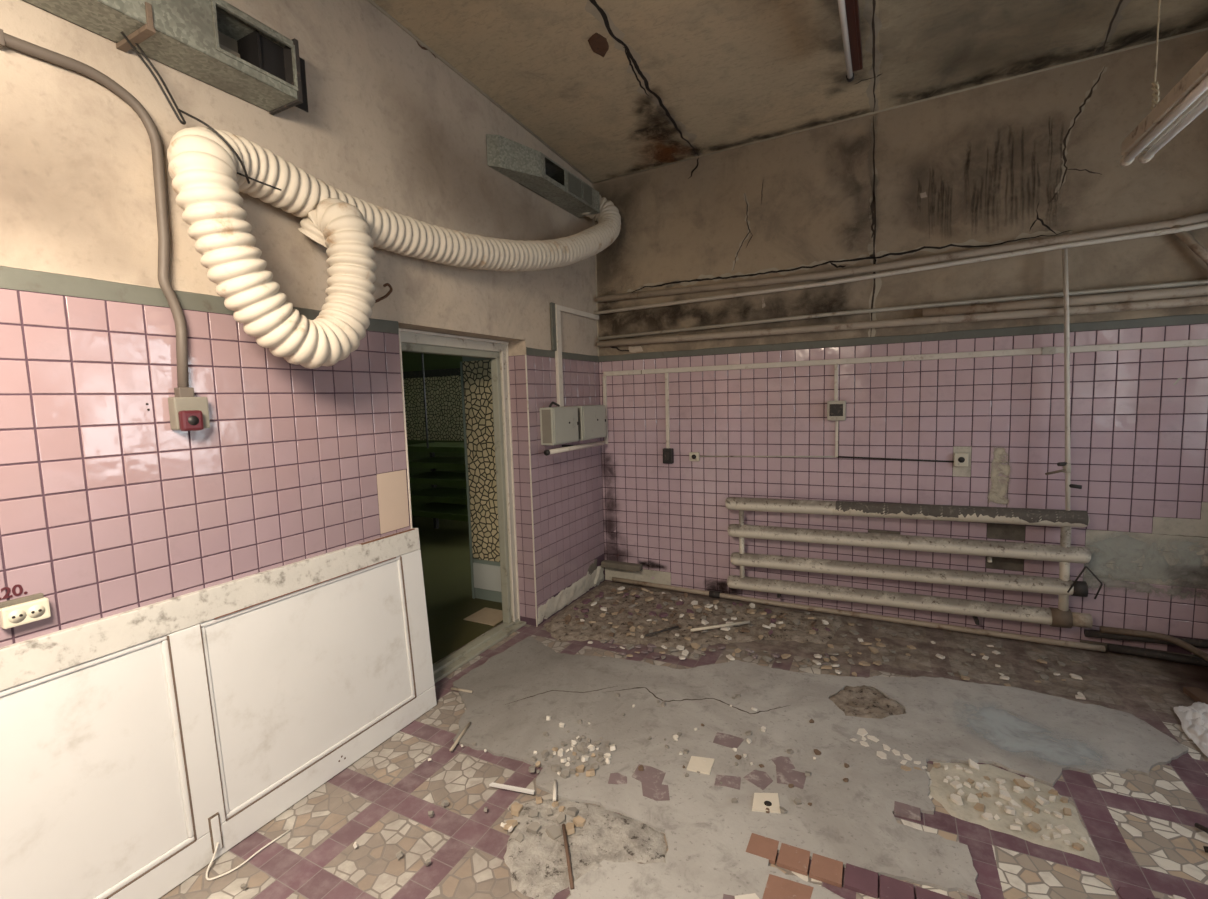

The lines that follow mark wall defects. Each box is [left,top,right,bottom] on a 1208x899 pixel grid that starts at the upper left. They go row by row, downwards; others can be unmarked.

crack [585,0,703,179]
crack [615,0,1131,337]
leakage [599,301,751,336]
leakage [803,294,846,318]
peeling [833,501,1208,598]
spalling [538,559,671,624]
crack [508,686,786,714]
spalling [813,654,906,719]
flaking render [665,723,707,777]
flaking render [732,726,766,768]
flaking render [763,784,812,814]
spalling [504,798,667,899]